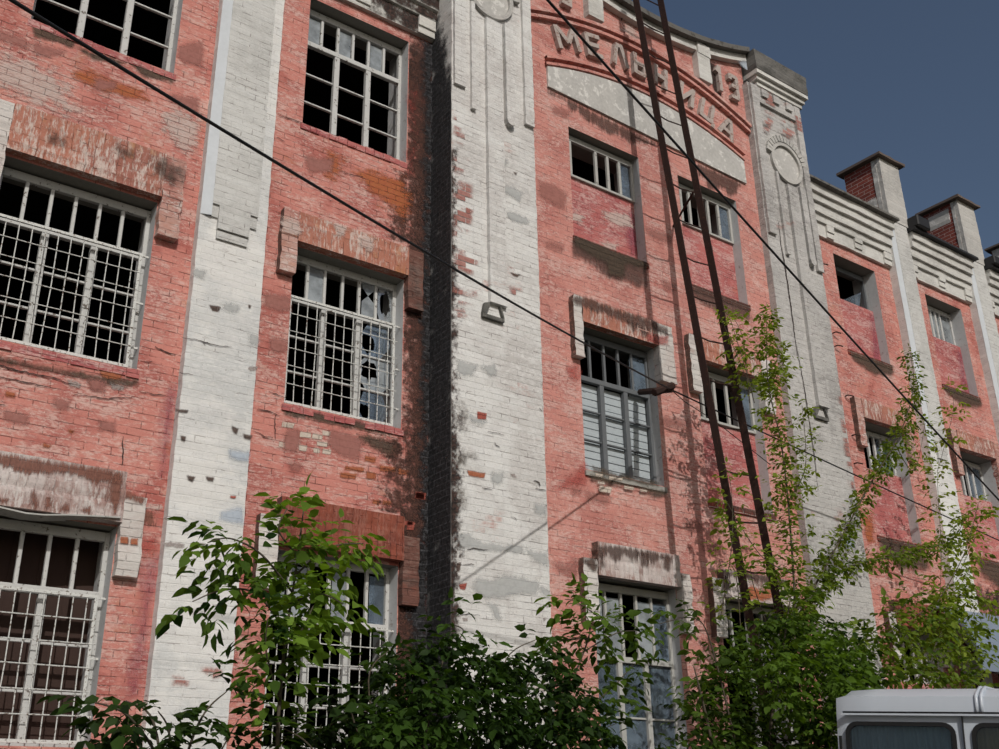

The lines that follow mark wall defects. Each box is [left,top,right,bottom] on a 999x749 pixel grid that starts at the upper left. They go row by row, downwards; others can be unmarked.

peeling [454,158,472,234]
damp [280,217,303,235]
peeling [456,250,477,274]
damp [575,295,668,344]
damp [285,0,464,725]
spalling [457,456,485,478]
damp [582,545,673,571]